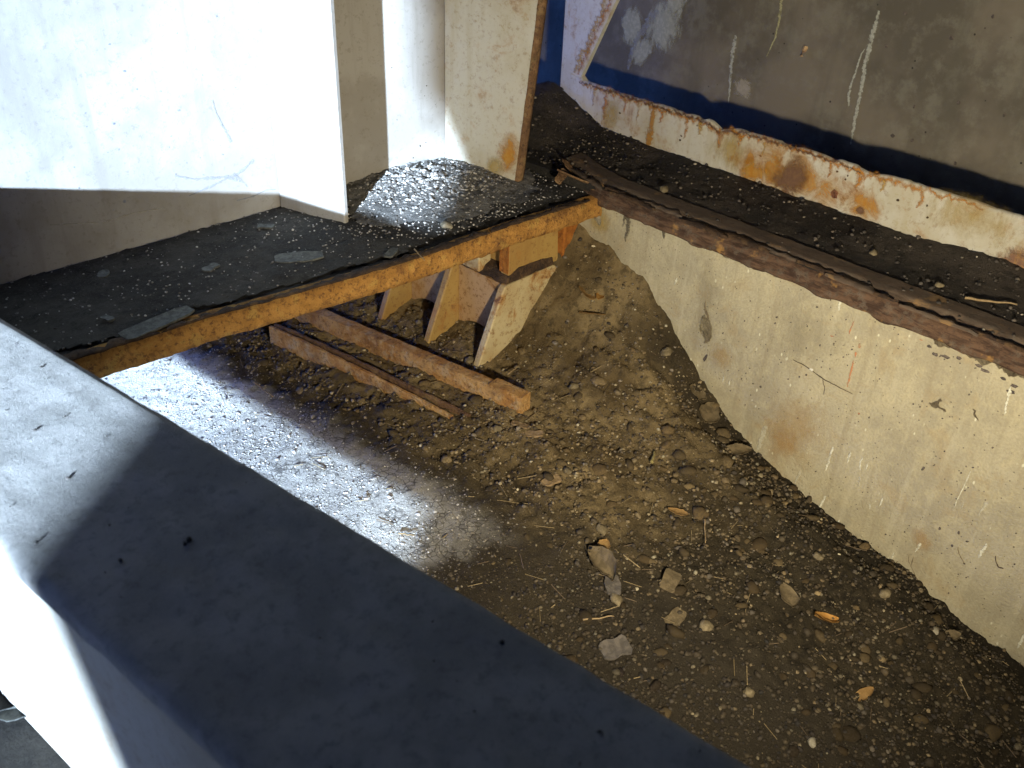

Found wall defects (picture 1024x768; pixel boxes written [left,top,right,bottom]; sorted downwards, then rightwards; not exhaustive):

rust [489,138,516,172]
rust [574,0,981,219]
leakage [847,11,880,144]
rust [605,187,895,302]
rust [1003,250,1024,268]